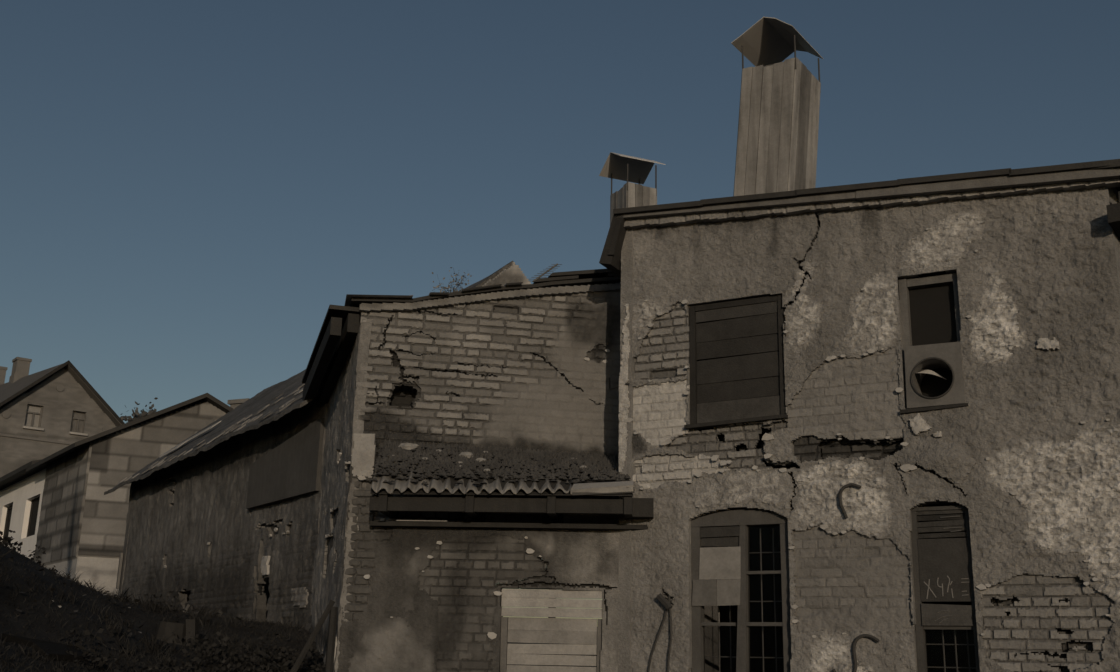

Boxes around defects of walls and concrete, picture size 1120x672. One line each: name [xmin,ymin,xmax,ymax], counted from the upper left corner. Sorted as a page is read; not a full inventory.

crack [365,311,495,405]
crack [784,214,820,319]
spalling [584,207,1060,672]
peeling [976,419,1120,672]